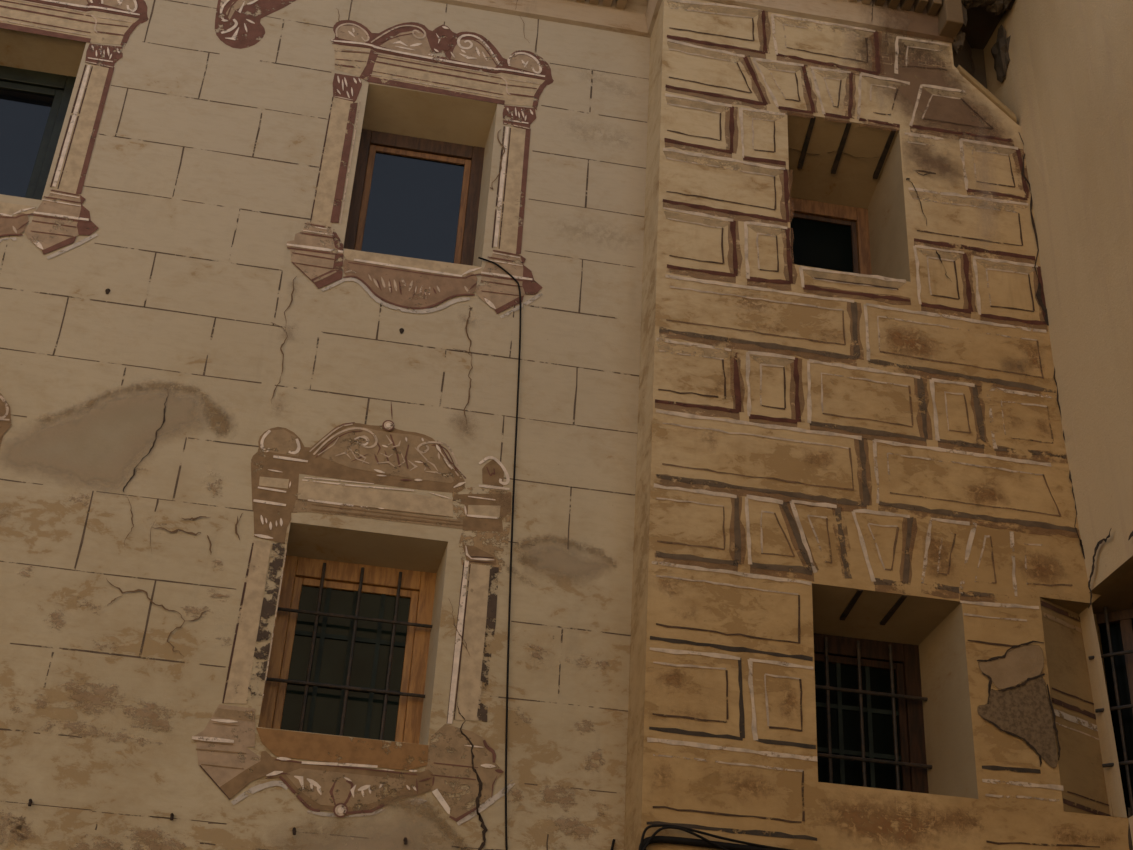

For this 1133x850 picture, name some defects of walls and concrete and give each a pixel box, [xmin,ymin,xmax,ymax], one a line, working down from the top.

spalling [952,0,1015,82]
crack [123,389,243,553]
crack [106,578,209,656]
flaking render [977,641,1061,768]
crack [457,704,494,850]